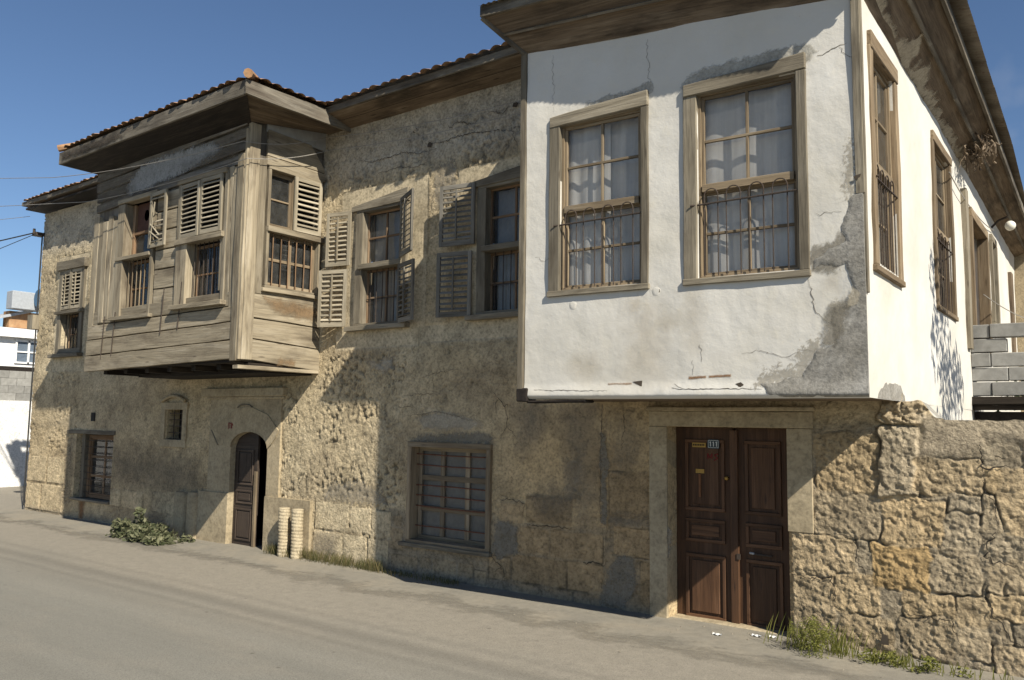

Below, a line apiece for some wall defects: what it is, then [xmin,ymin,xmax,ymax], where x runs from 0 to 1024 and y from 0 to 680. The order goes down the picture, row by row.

crack [361,107,519,174]